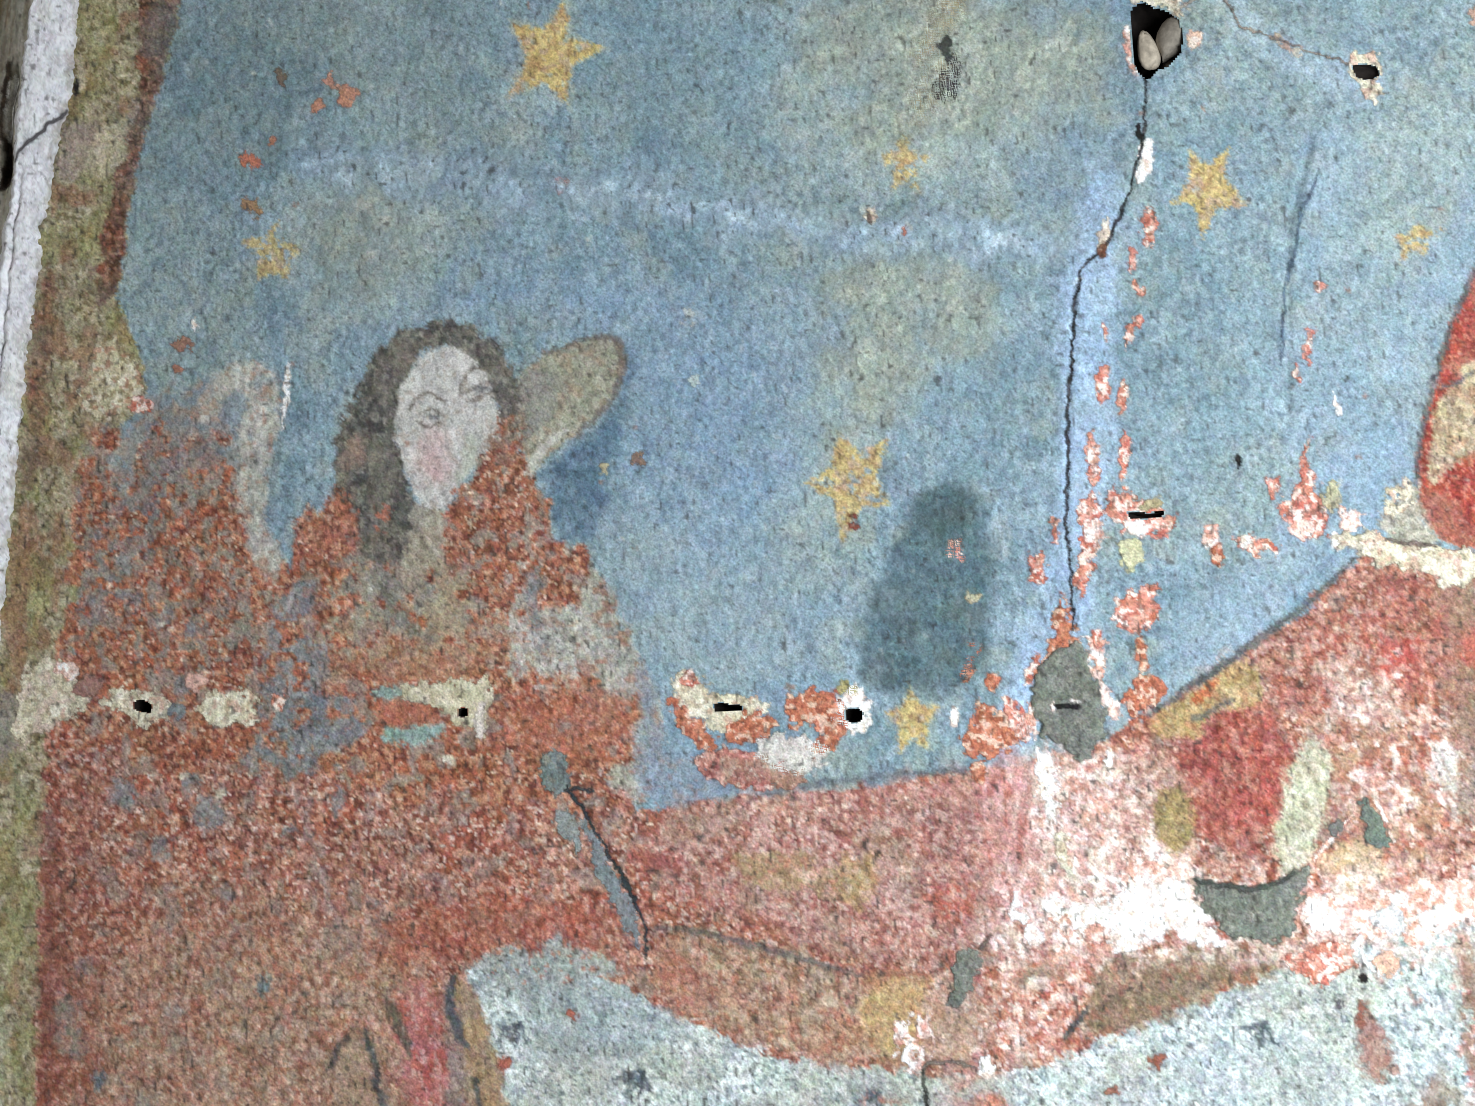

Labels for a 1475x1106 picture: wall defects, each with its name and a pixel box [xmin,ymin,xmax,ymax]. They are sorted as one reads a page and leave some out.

crack [1172,0,1350,65]
peeling [1128,206,1160,296]
crack [1280,175,1318,362]
crack [1063,78,1154,631]
peeling [1094,365,1129,415]
water stain [862,488,992,691]
crack [1385,538,1437,548]
peeling [950,429,1176,877]
peeling [10,656,286,751]
peeling [400,674,493,739]
peeling [666,669,873,792]
crack [922,1060,976,1106]